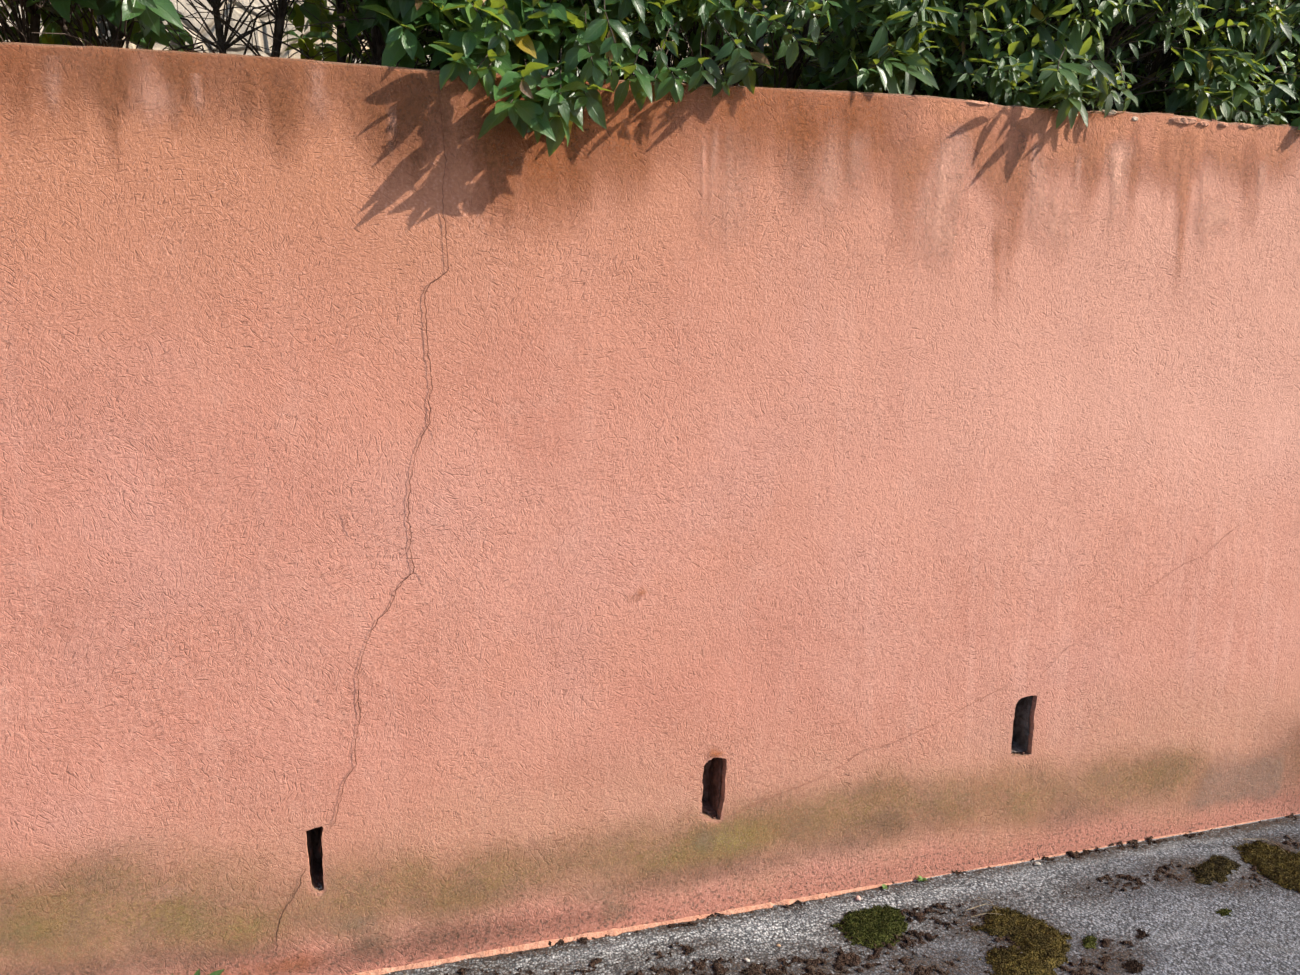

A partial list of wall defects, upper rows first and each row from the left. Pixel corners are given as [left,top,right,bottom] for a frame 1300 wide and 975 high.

water stain [50,47,452,152]
water stain [474,76,684,196]
water stain [705,86,1297,254]
crack [329,71,459,831]
crack [275,869,306,955]